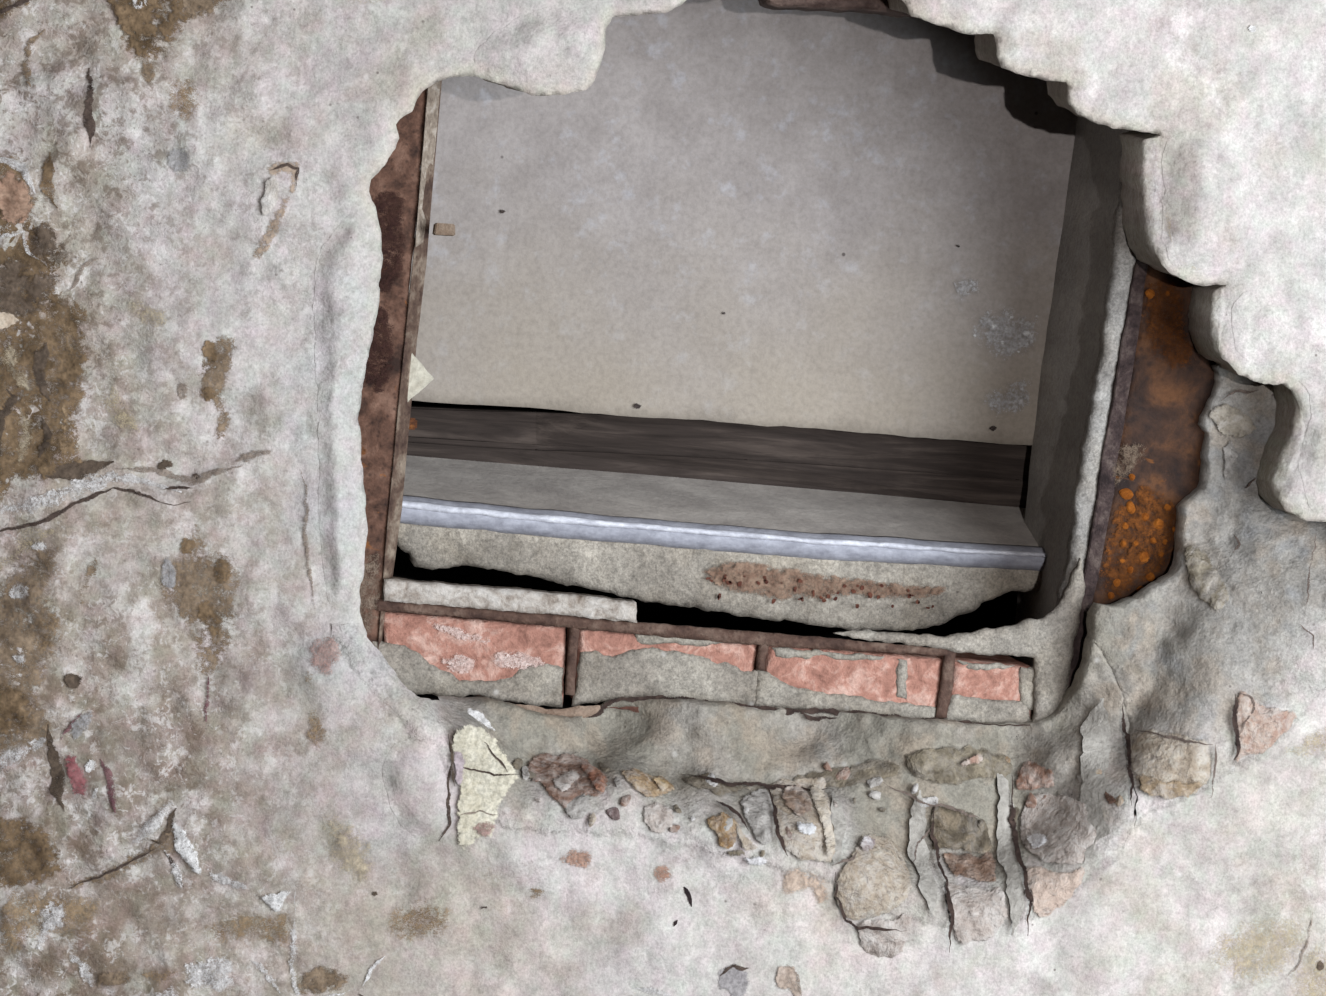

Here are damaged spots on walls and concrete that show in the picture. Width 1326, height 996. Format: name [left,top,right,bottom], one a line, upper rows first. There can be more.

corrosion [363,190,407,392]
crack [0,450,273,532]
flaking render [301,472,315,607]
corrosion [1099,474,1176,600]
corrosion [359,553,381,633]
corrosion [702,561,946,609]
spalling [304,363,1326,958]
peeling [65,802,248,889]
peeling [30,900,67,949]
peeling [154,956,234,996]
peeling [262,890,301,996]